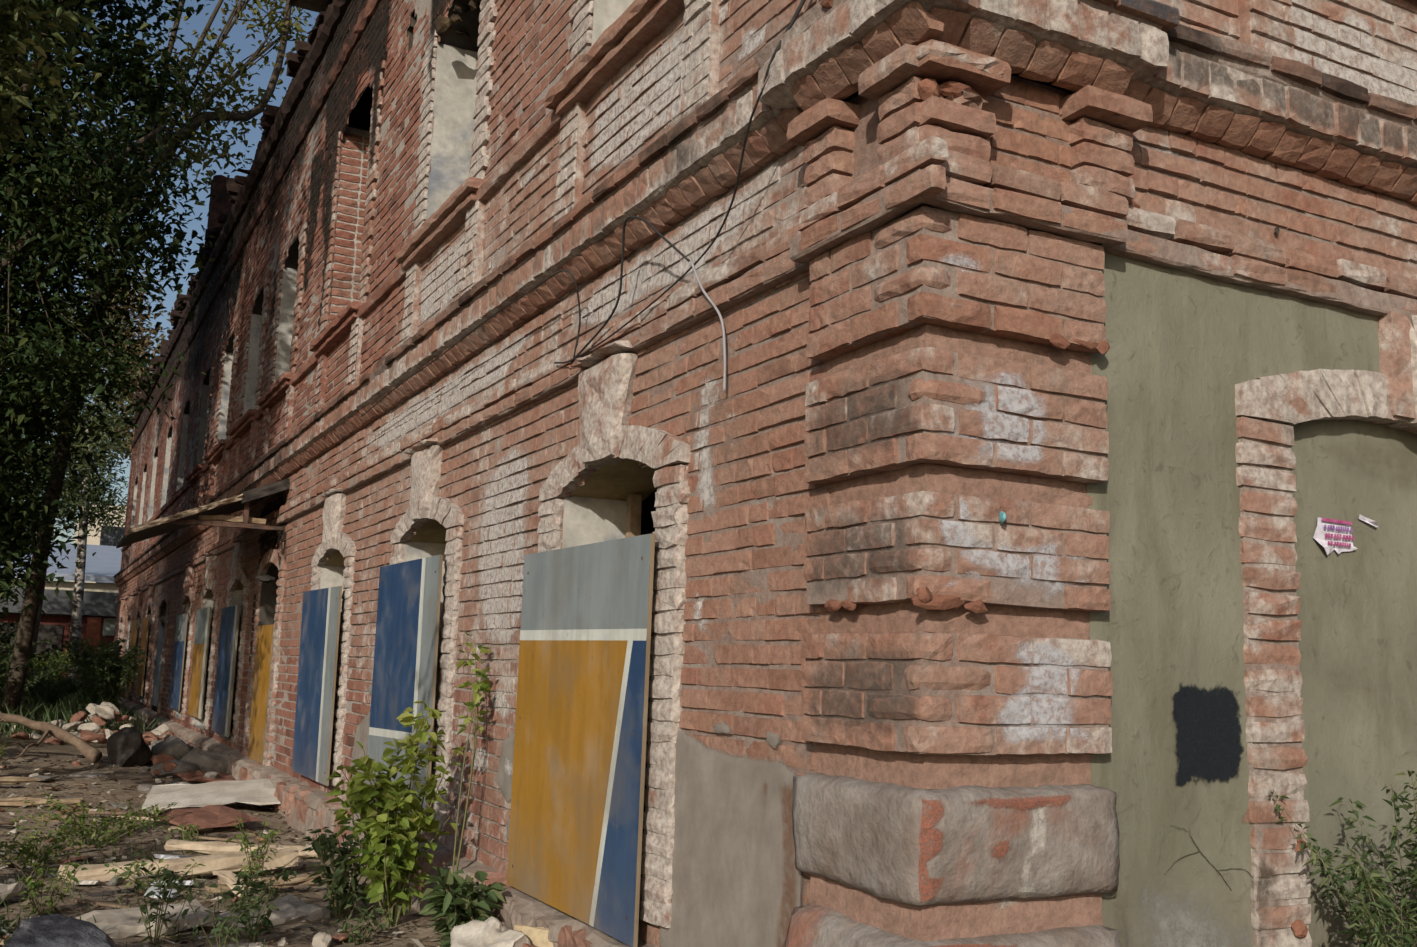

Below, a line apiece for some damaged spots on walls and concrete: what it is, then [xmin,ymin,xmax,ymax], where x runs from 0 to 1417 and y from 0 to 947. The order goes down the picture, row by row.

water stain [369,40,387,168]
water stain [303,150,332,325]
flaking render [918,799,944,901]
flaking render [977,795,1071,810]